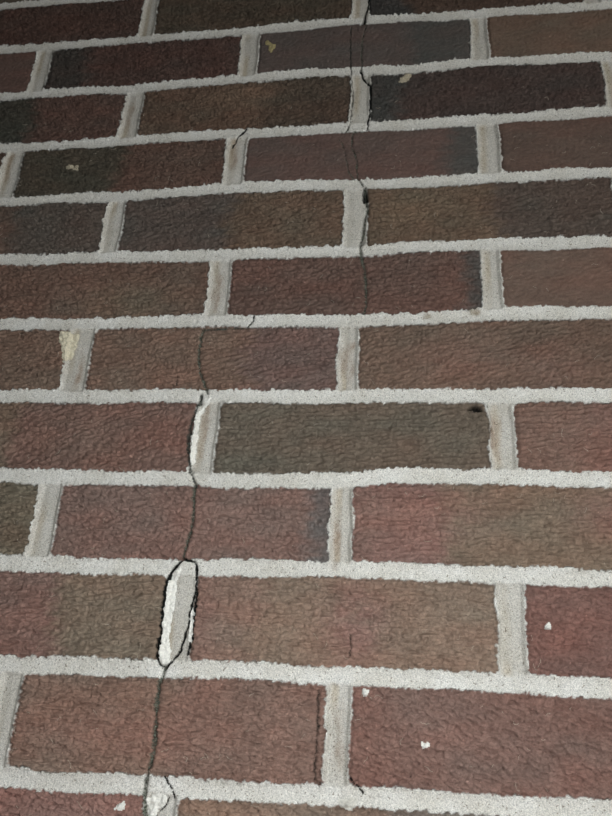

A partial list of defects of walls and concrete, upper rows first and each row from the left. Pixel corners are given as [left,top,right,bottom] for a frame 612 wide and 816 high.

crack [339,0,372,315]
crack [143,316,255,816]
crack [313,692,321,780]